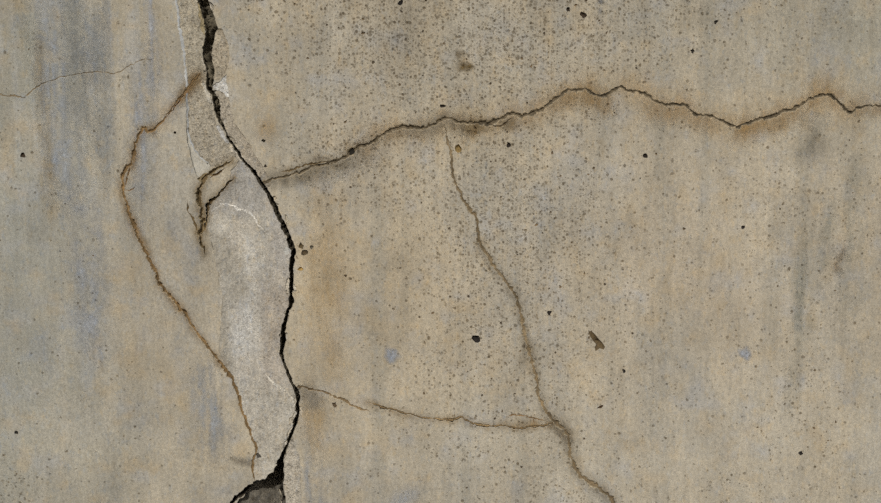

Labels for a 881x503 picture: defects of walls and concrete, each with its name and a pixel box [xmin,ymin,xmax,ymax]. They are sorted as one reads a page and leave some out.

crack [0,58,155,98]
crack [120,72,258,483]
spalling [175,0,302,503]
crack [197,0,881,503]